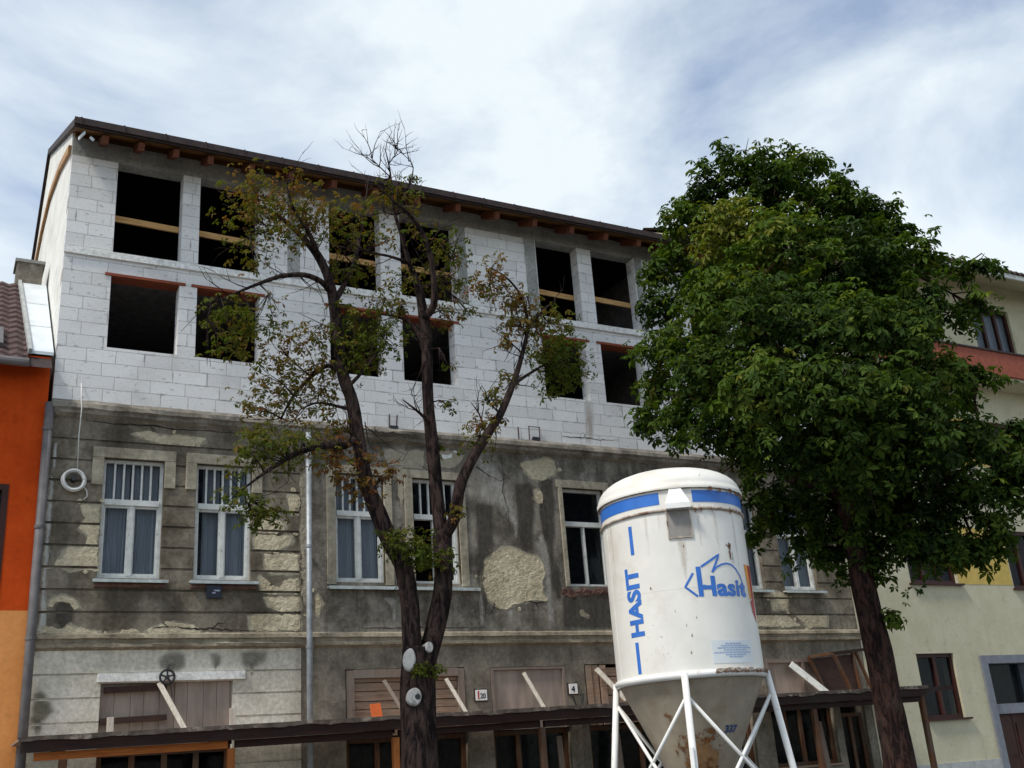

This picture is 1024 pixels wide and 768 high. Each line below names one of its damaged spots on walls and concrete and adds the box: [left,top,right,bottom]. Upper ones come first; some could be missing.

peeling [132,430,207,447]
peeling [520,456,562,505]
peeling [247,472,324,632]
peeling [43,593,82,611]
crack [154,622,249,631]
peeling [475,545,561,612]